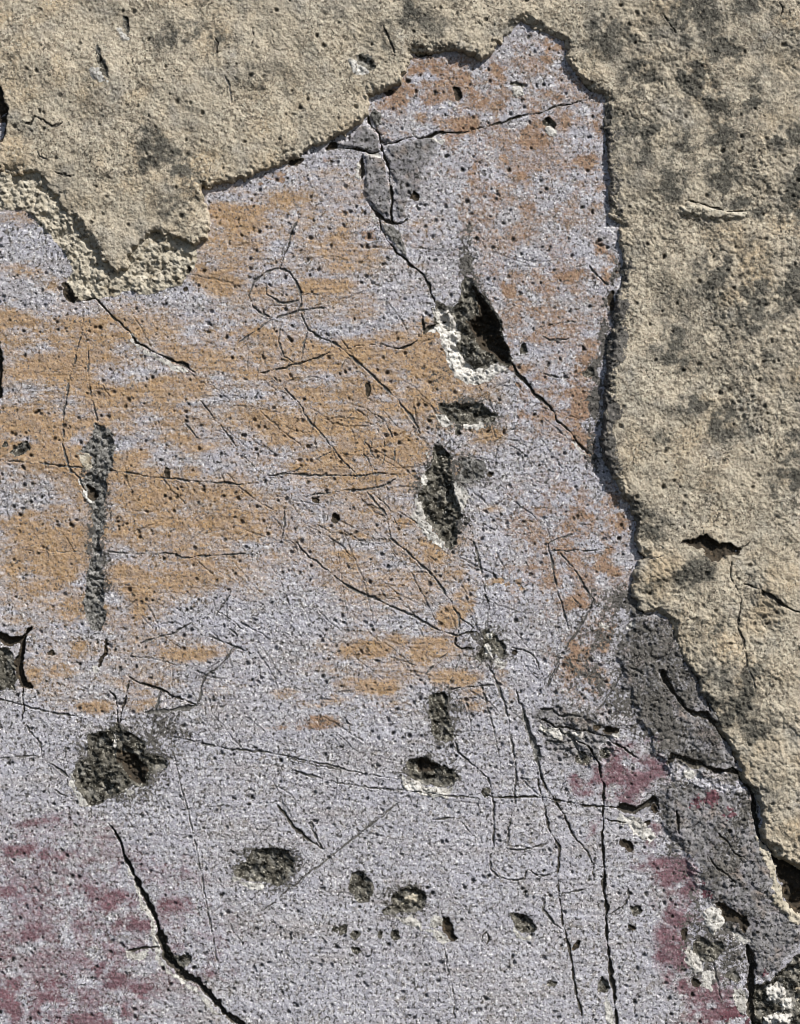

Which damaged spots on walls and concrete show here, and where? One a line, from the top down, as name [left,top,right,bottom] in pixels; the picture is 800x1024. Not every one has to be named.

crack [346,100,587,350]
spalling [405,286,528,568]
crack [0,627,86,799]
spalling [55,700,194,817]
spalling [390,682,475,799]
crack [660,669,765,845]
crack [111,827,245,1024]
spalling [213,805,323,902]
spalling [348,870,458,945]
crack [175,690,659,1024]
crack [745,944,757,1024]
spalling [732,954,800,1024]